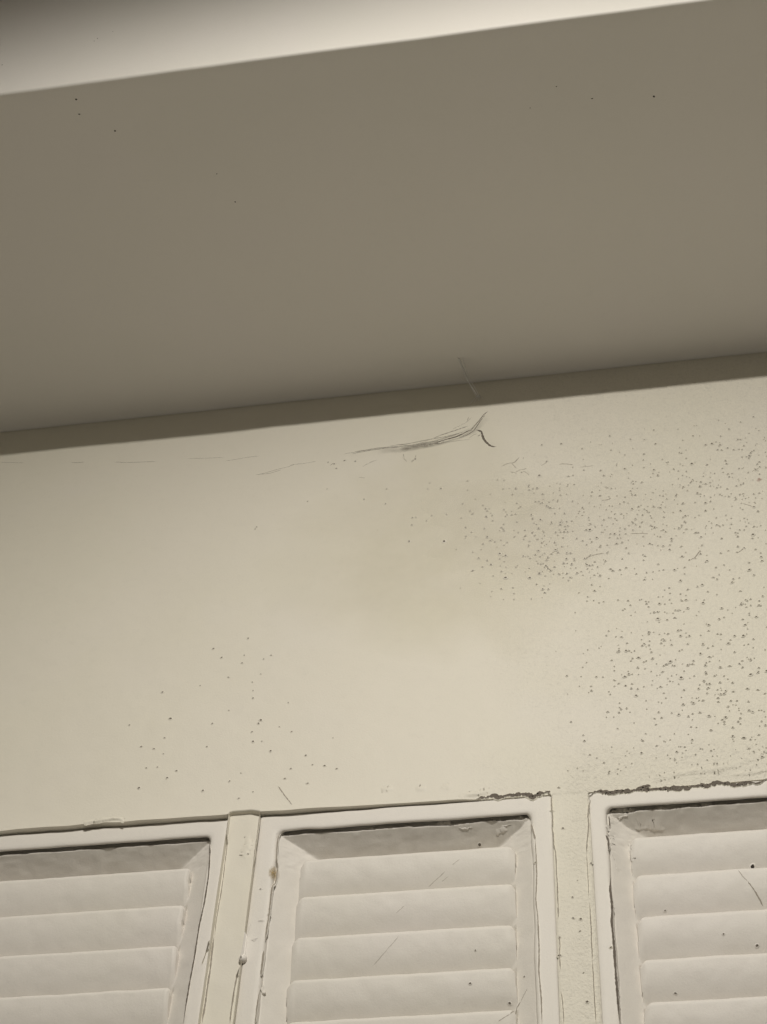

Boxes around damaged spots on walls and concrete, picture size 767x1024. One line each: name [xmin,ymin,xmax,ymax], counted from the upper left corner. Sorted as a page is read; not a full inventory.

crack [349,411,593,475]